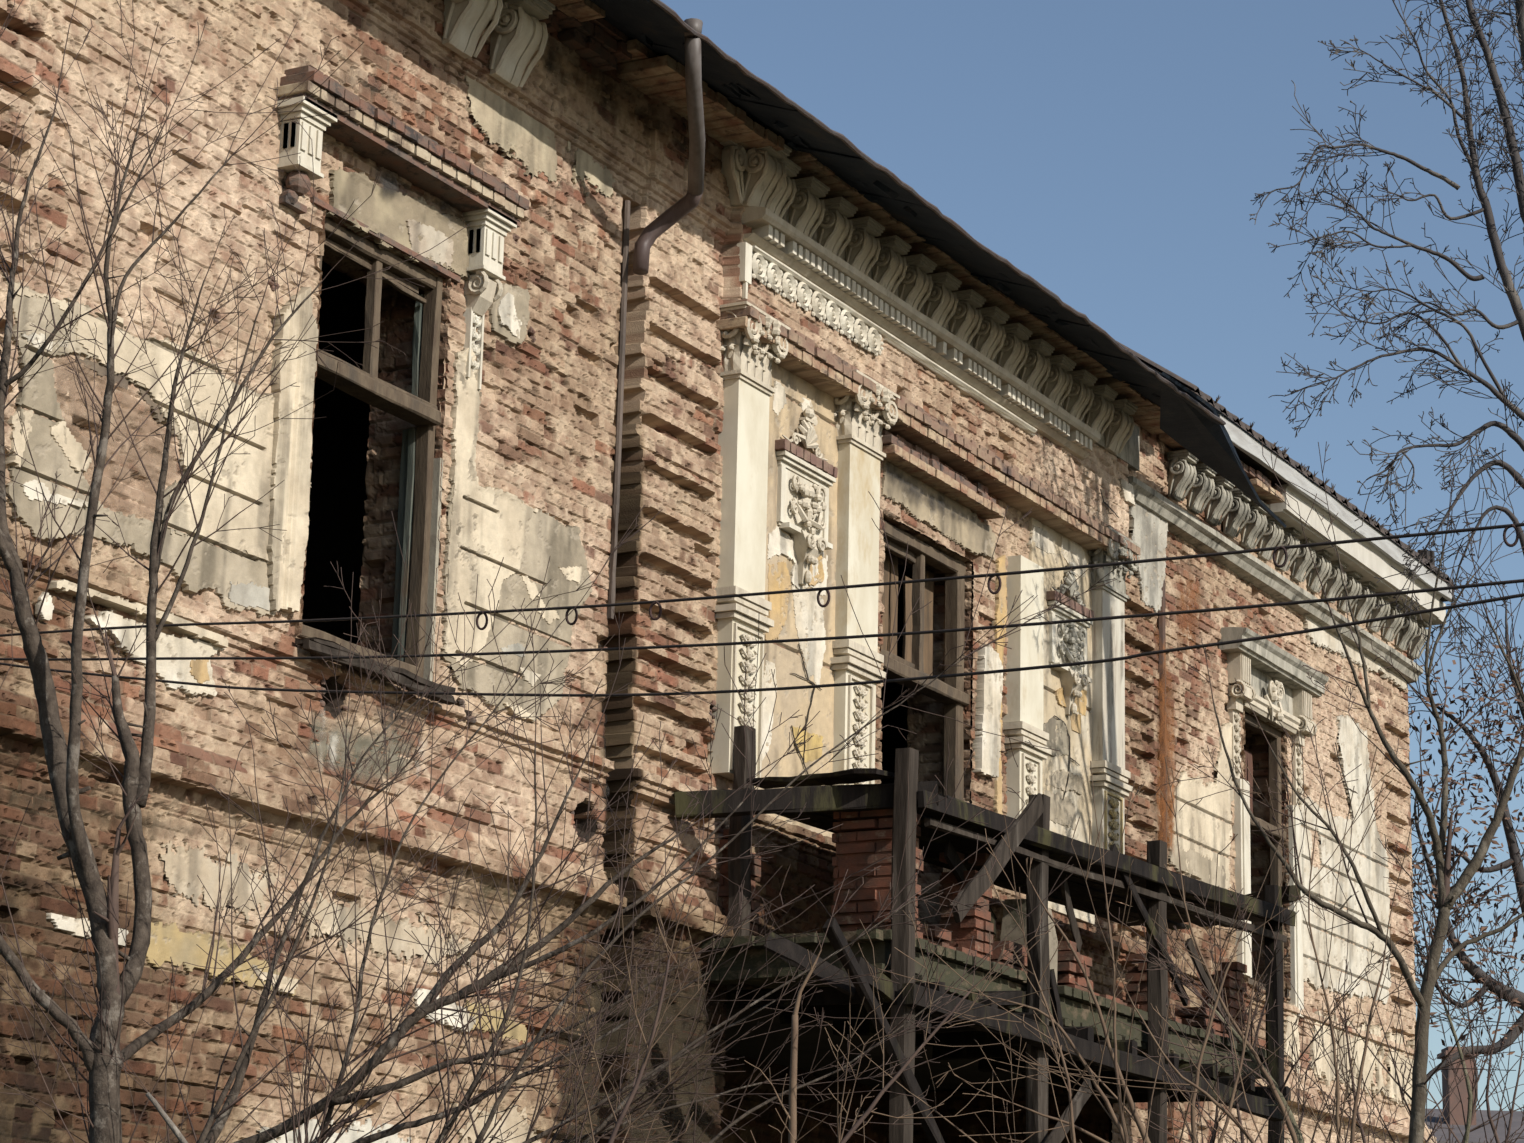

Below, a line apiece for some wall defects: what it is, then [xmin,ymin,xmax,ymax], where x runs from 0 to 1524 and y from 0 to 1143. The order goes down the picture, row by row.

peeling [1,271,319,617]
peeling [440,348,592,724]
peeling [1167,721,1234,890]
peeling [46,913,91,939]
peeling [118,928,129,947]
peeling [146,841,299,996]
peeling [299,890,472,967]
peeling [1284,715,1415,1106]
peeling [413,988,527,1043]
peeling [257,1118,412,1143]
peeling [451,1103,542,1143]